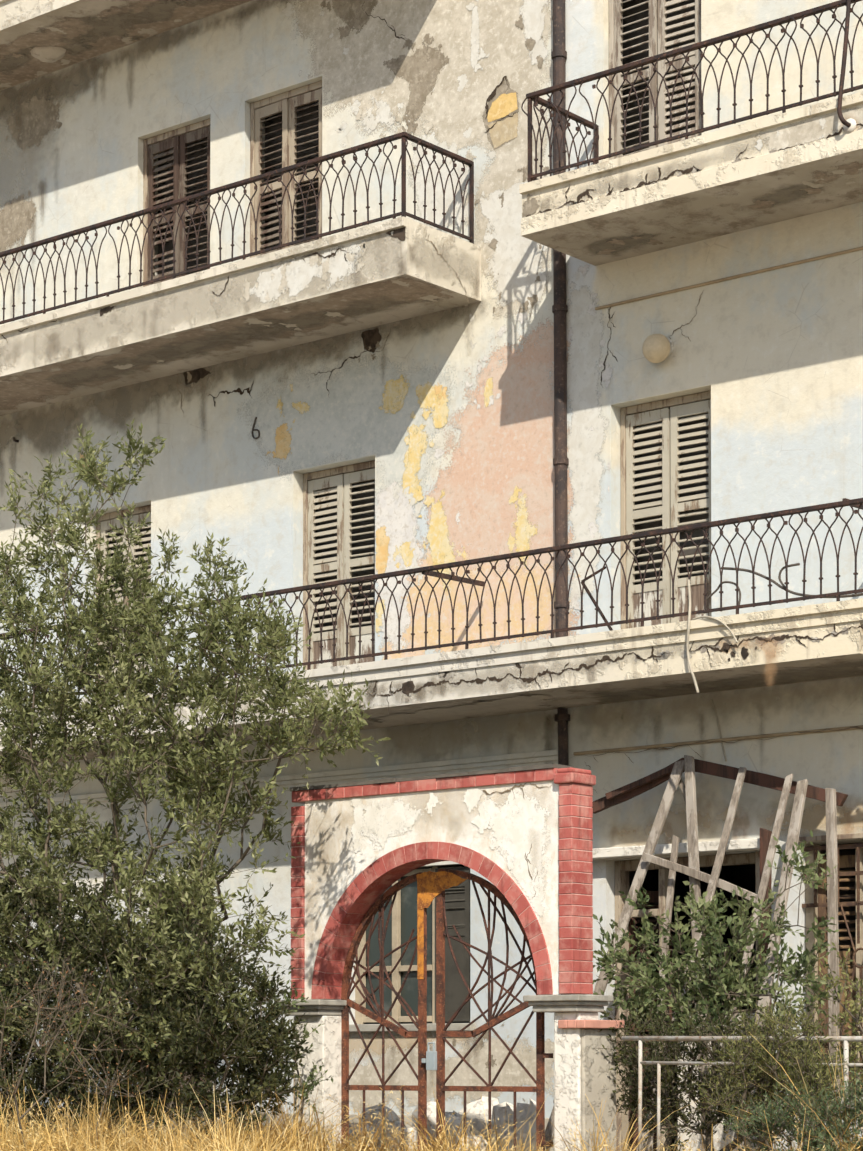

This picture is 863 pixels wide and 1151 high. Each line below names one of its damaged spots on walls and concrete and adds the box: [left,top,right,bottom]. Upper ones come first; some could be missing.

peeling [0,0,251,90]
spalling [6,96,62,152]
crack [732,123,863,163]
spalling [0,190,37,252]
crack [526,166,703,217]
peeling [0,241,453,410]
peeling [237,0,613,660]
crack [601,307,618,385]
crack [176,380,254,411]
crack [364,624,863,714]
peeling [463,787,551,925]
rust [416,871,467,979]